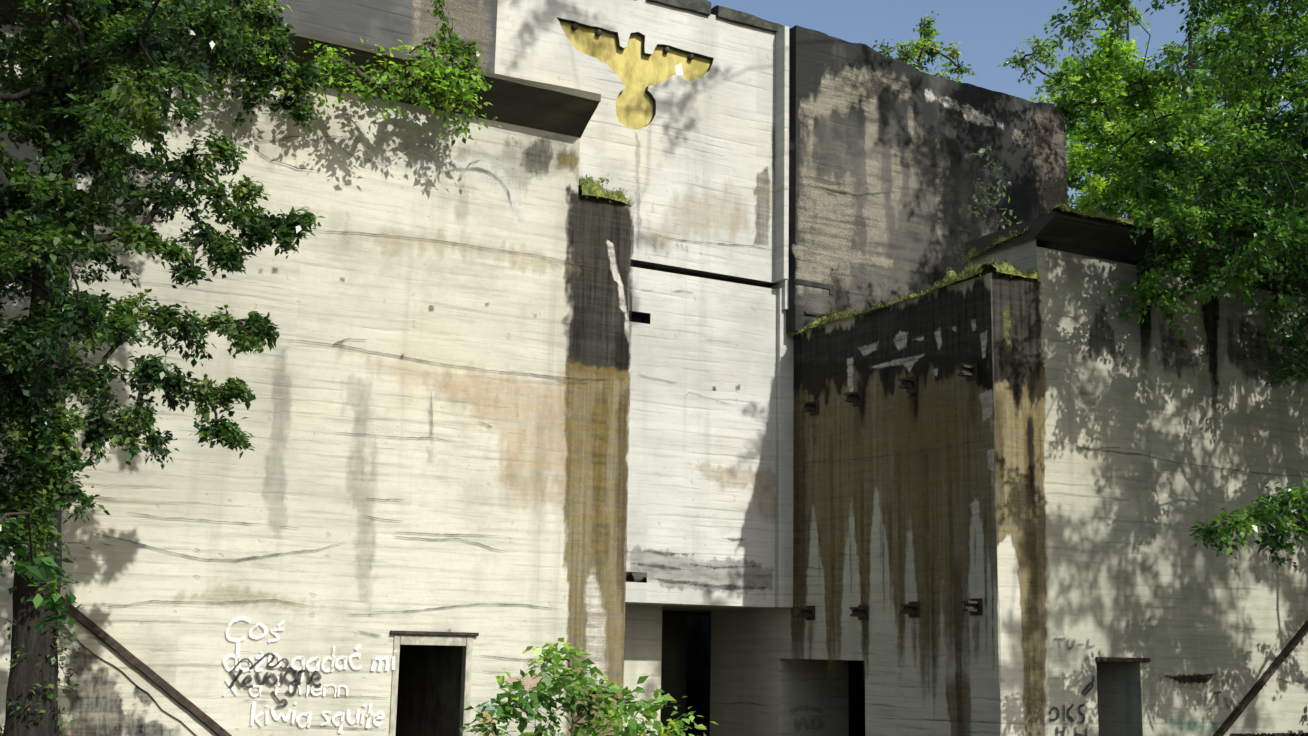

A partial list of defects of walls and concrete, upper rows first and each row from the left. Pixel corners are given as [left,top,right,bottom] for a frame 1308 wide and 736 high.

crack [246,136,385,172]
crack [443,160,512,205]
leakage [559,153,578,168]
leakage [794,68,917,293]
leakage [926,91,990,126]
leakage [1083,258,1151,367]
leakage [1199,270,1220,409]
leakage [564,187,634,736]
leakage [791,267,1048,736]